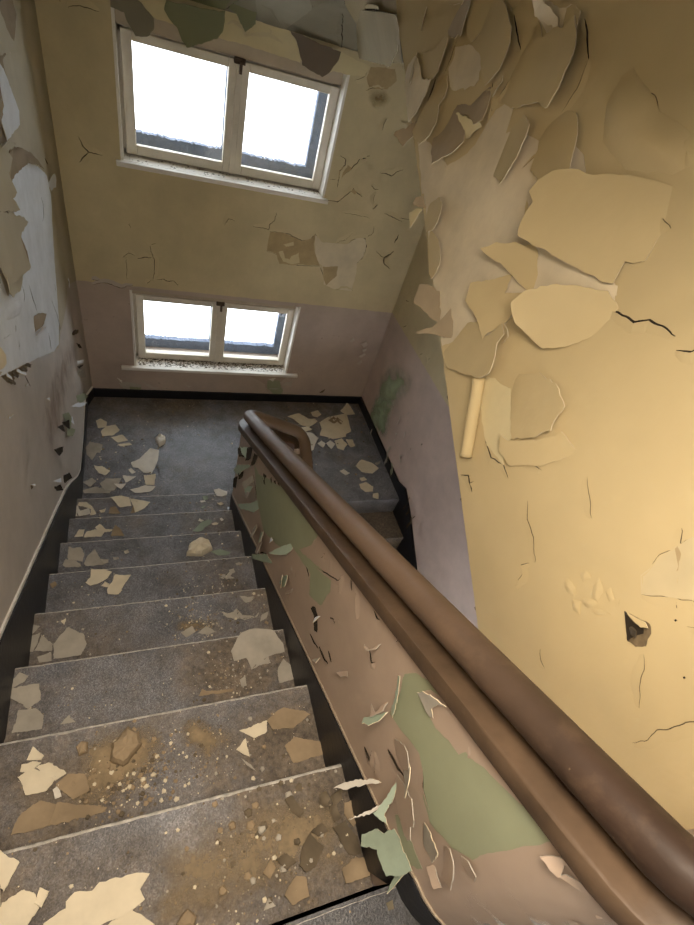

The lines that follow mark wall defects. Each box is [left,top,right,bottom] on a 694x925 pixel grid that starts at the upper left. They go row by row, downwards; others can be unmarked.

peeling [0,0,61,386]
peeling [110,0,673,479]
peeling [54,392,88,456]
peeling [340,412,409,499]
peeling [211,447,341,666]
peeling [641,528,694,610]
spalling [624,611,651,647]
crack [630,654,645,707]
peeling [236,707,323,771]
crack [632,721,694,750]
peeling [263,673,550,905]
peeling [540,855,590,896]